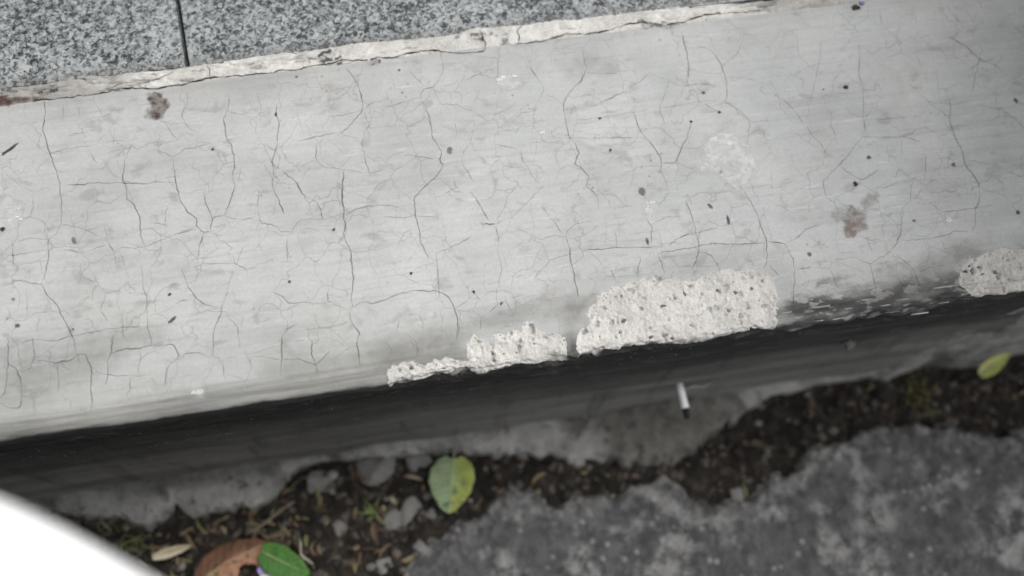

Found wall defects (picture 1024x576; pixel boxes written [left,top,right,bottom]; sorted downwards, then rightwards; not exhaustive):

crack [517,10,762,44]
corrosion [148,93,169,118]
crack [34,34,486,169]
spalling [933,247,1024,300]
spalling [386,268,866,390]